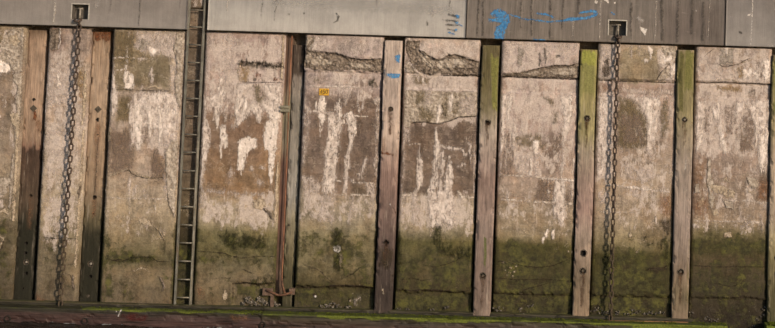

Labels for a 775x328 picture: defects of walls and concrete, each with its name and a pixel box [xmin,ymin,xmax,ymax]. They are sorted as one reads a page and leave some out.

spalling [304,37,383,72]
spalling [405,40,479,77]
spalling [503,63,579,80]
water stain [199,34,284,210]
water stain [302,79,380,222]
water stain [390,126,476,236]
water stain [333,231,346,271]